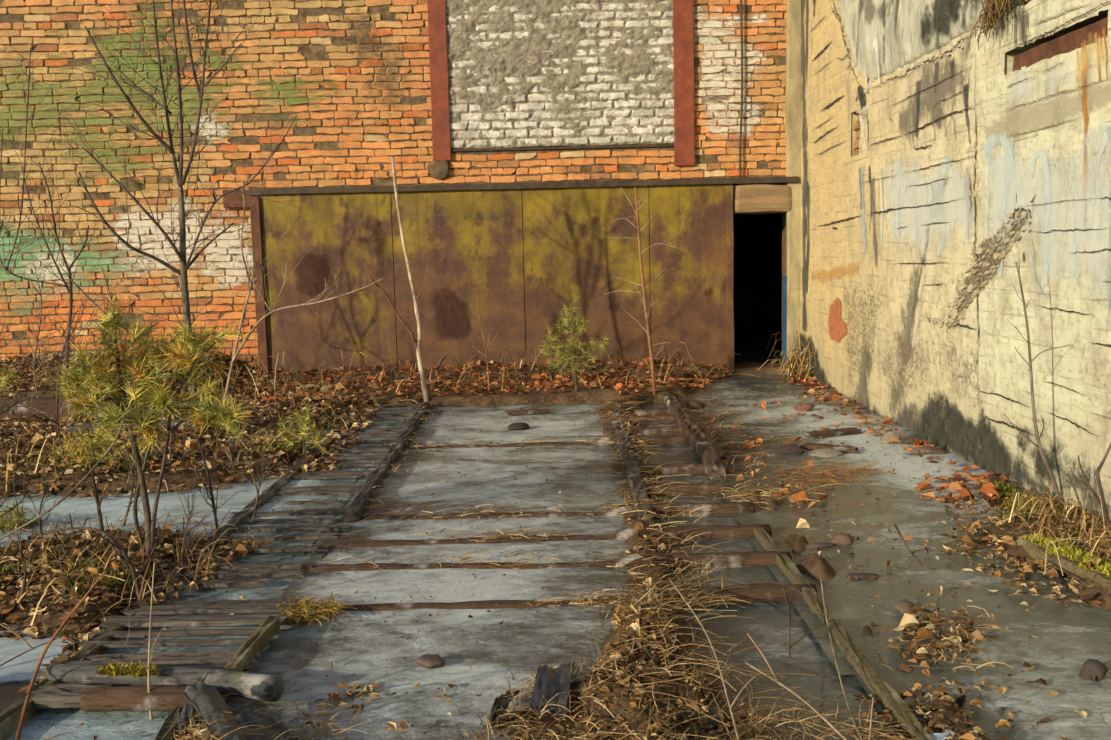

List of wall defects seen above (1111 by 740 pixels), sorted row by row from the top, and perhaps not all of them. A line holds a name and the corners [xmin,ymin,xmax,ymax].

rust [293,252,328,296]
rust [430,288,468,339]
spalling [842,194,1036,406]
leakage [899,0,989,142]
crack [811,0,1111,436]
leakage [852,209,1108,519]
rust [1080,29,1107,227]